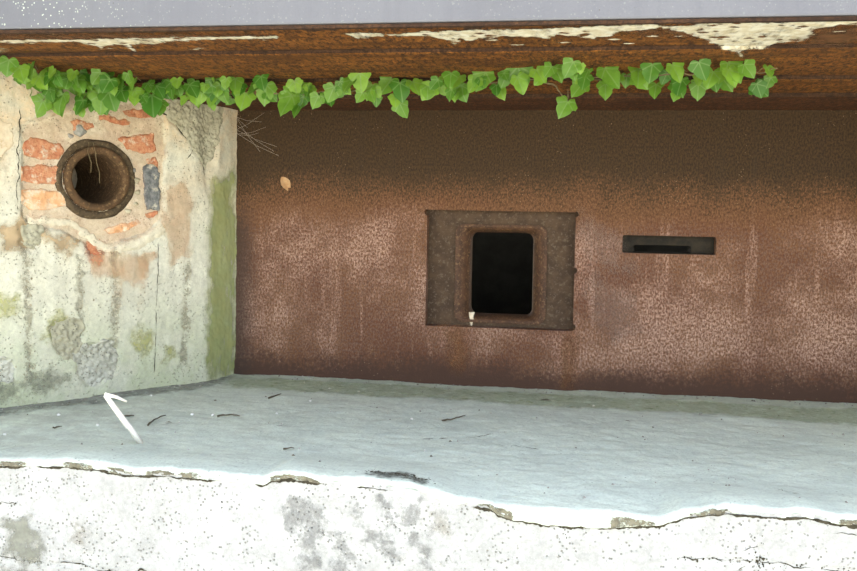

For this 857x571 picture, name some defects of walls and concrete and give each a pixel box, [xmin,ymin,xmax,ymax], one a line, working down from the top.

peeling [0,36,278,51]
peeling [346,21,857,56]
flaking render [17,99,224,254]
crack [0,466,214,482]
crack [255,478,322,487]
crack [474,506,857,571]